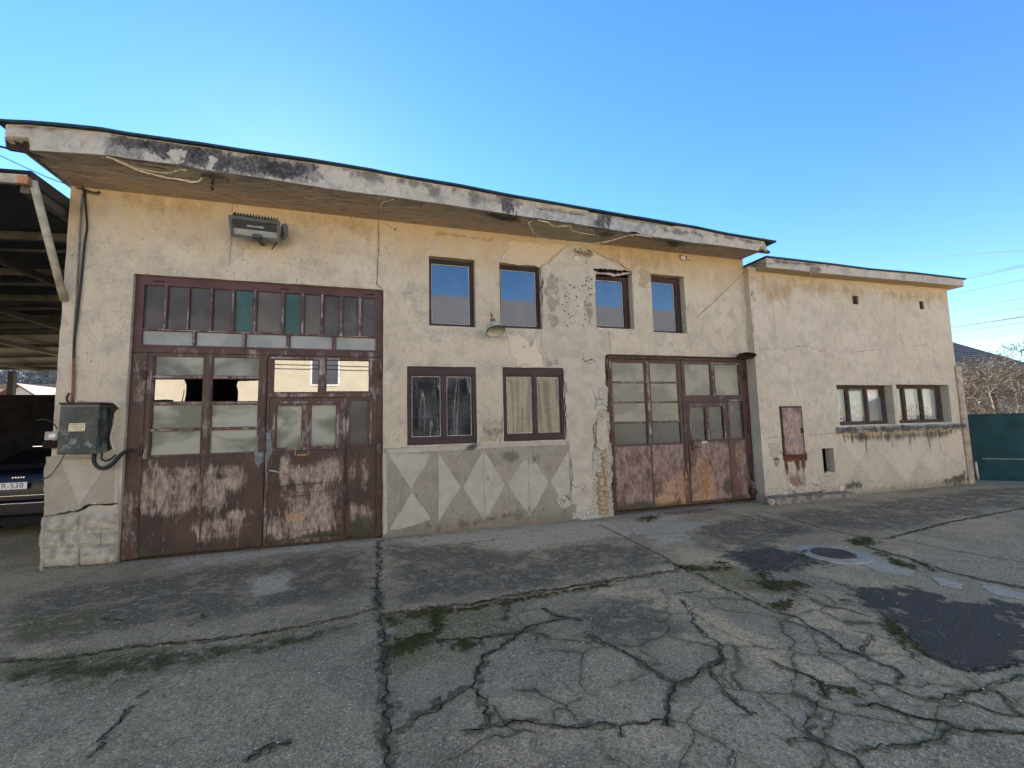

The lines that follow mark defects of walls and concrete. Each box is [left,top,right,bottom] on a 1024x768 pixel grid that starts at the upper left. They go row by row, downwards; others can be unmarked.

leakage [105,135,323,183]
crack [375,198,394,292]
flaking render [502,205,667,520]
leakage [842,424,966,451]
corrosion [781,452,807,487]